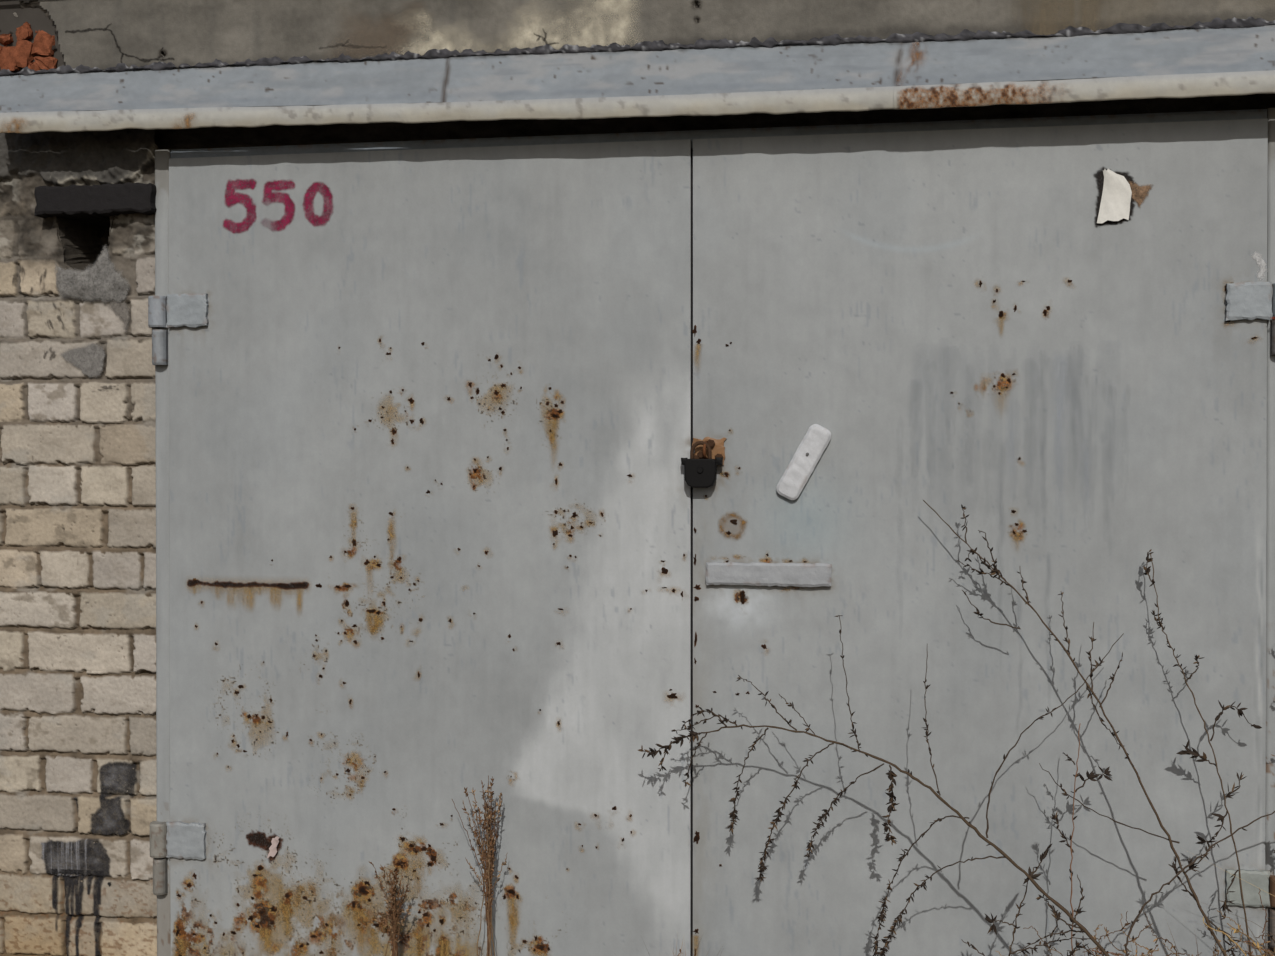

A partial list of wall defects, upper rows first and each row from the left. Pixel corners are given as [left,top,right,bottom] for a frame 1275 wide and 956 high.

spalling [0,0,66,72]
crack [65,24,174,63]
water stain [510,0,631,49]
corrosion [898,85,1044,109]
corrosion [354,389,424,444]
corrosion [468,354,522,450]
corrosion [540,387,564,446]
corrosion [551,504,604,545]
corrosion [187,507,419,644]
peeling [246,832,283,862]
corrosion [173,837,484,956]
corrosion [502,868,550,956]